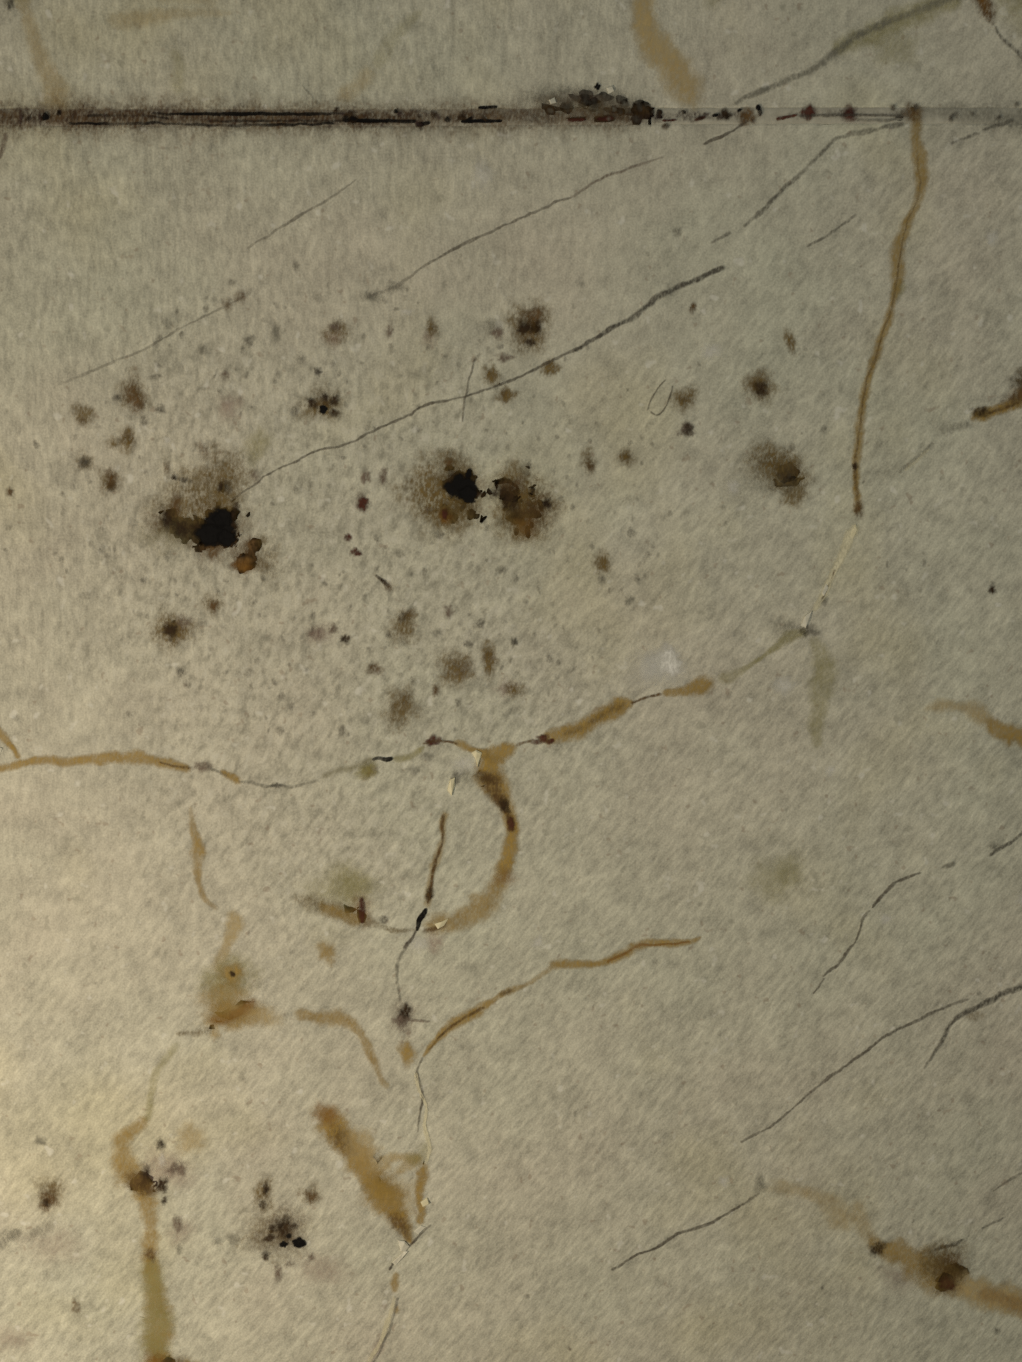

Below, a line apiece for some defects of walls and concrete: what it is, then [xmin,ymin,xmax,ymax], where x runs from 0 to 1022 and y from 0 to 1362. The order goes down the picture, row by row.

leakage [306,395,338,417]
leakage [155,447,266,570]
leakage [357,470,387,511]
leakage [407,454,556,539]
leakage [155,618,191,646]
crack [0,730,285,788]
crack [361,678,711,948]
crack [813,874,915,994]
crack [825,986,1022,1081]
leakage [262,1217,312,1276]
crack [369,1004,431,1362]
crack [612,1183,760,1270]